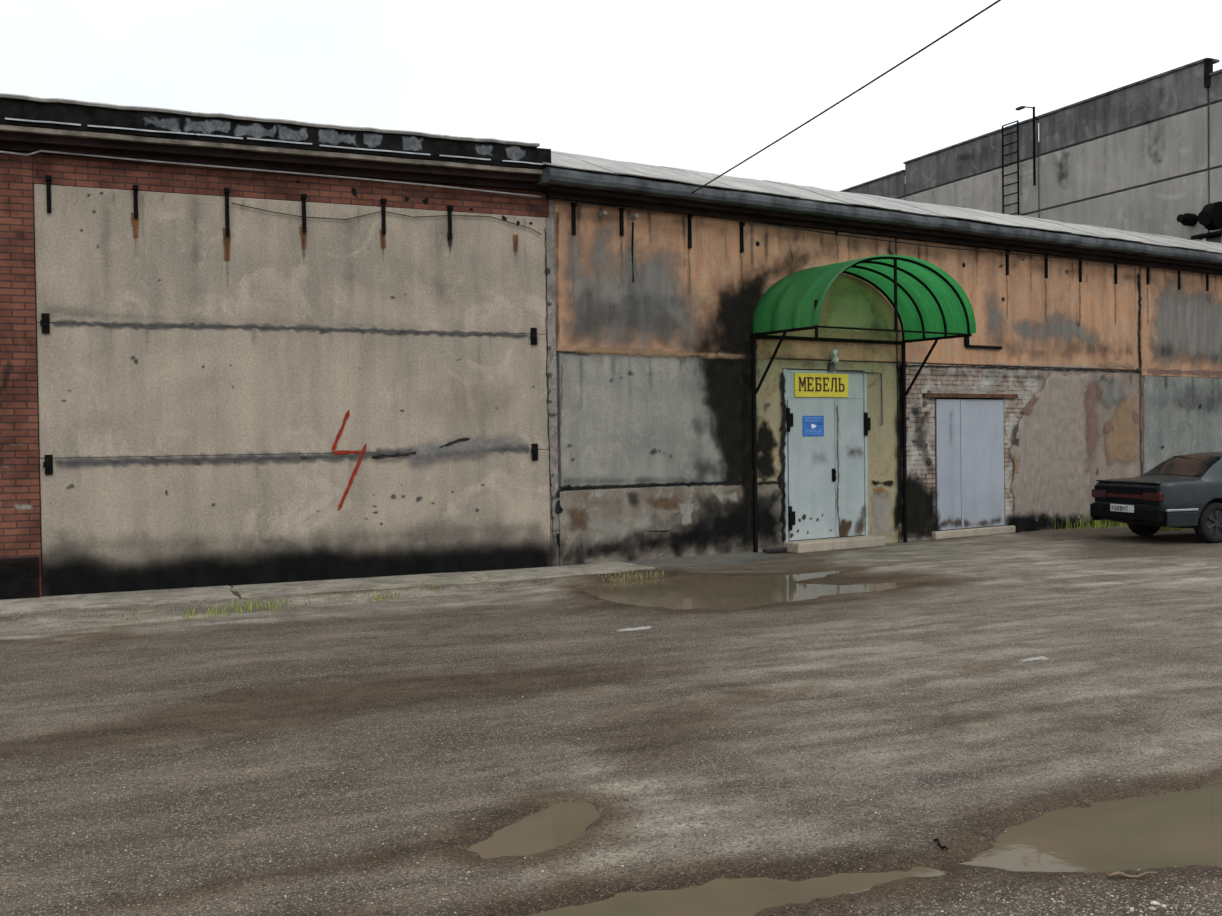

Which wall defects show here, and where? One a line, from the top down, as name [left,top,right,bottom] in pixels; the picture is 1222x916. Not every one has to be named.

leakage [0,260,806,600]
flaking render [1010,362,1222,529]